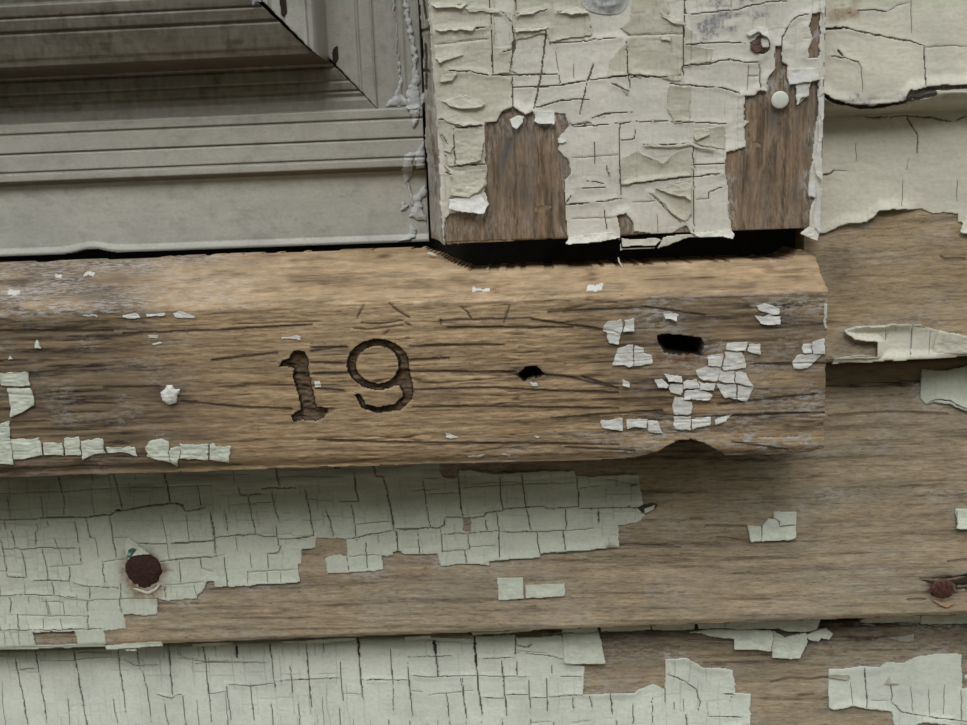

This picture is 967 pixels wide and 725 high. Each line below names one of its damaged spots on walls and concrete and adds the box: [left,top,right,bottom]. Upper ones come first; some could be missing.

peeling [425,0,661,247]
peeling [603,0,967,369]
peeling [123,311,195,319]
peeling [586,283,603,292]
peeling [0,372,231,466]
peeling [104,342,967,725]
peeling [33,631,78,648]
crack [0,466,653,725]
crack [668,674,741,725]